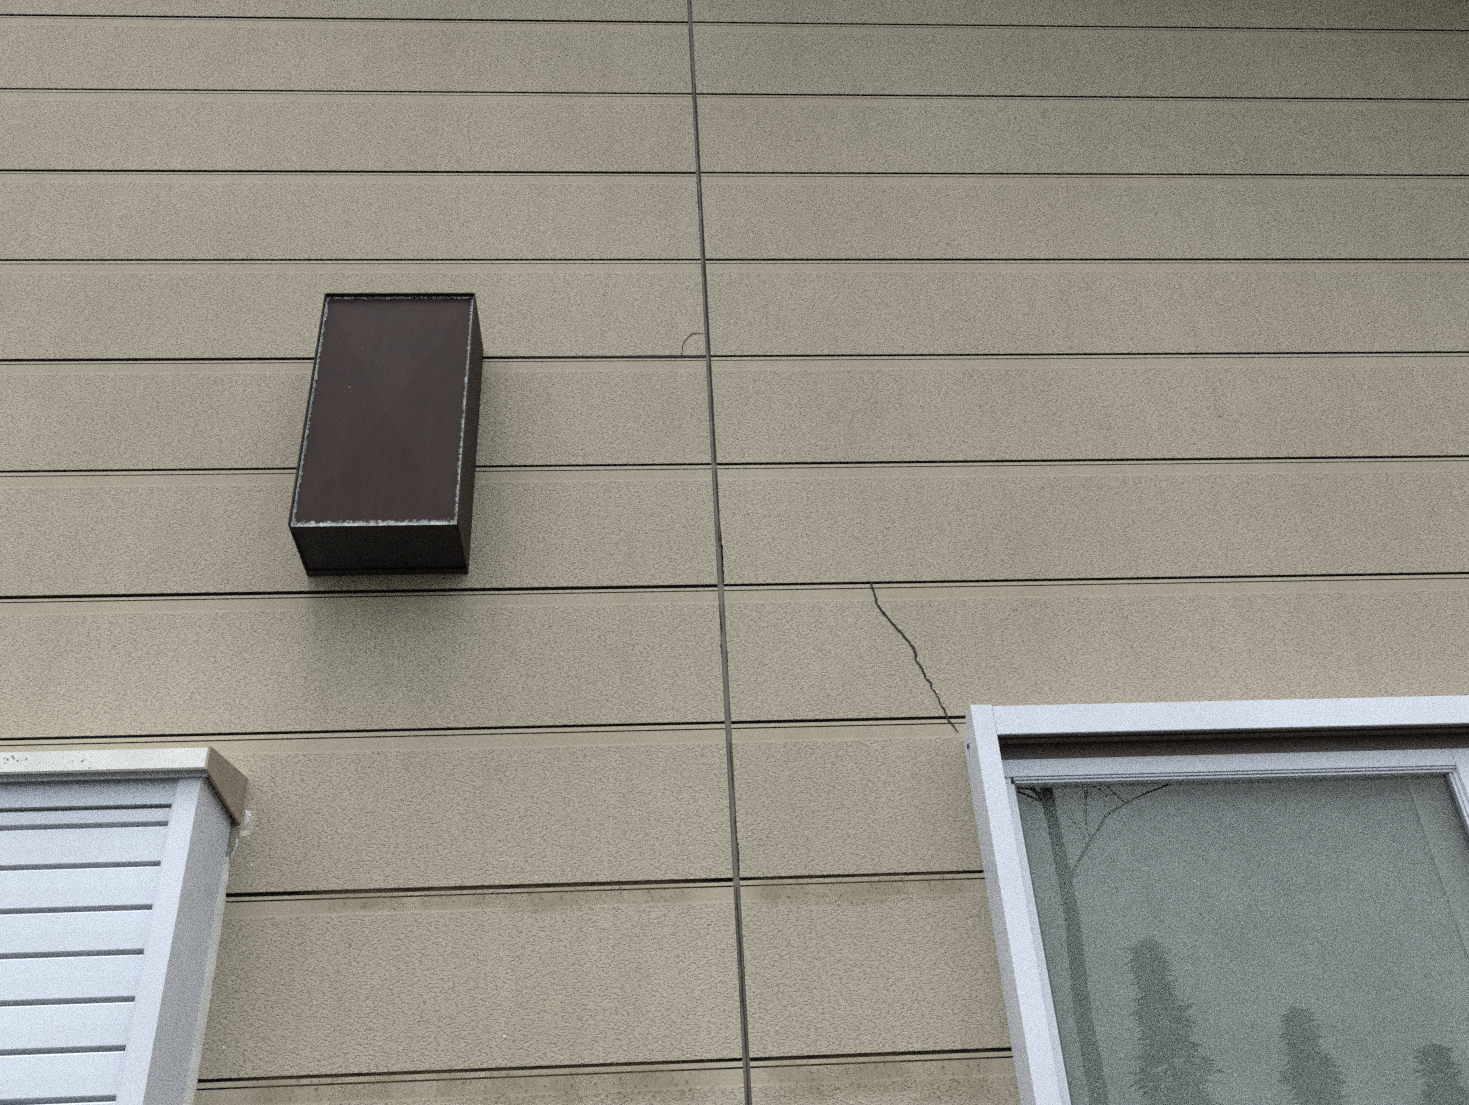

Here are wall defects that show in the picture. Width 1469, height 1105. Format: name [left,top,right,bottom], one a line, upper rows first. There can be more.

crack [870,581,959,732]